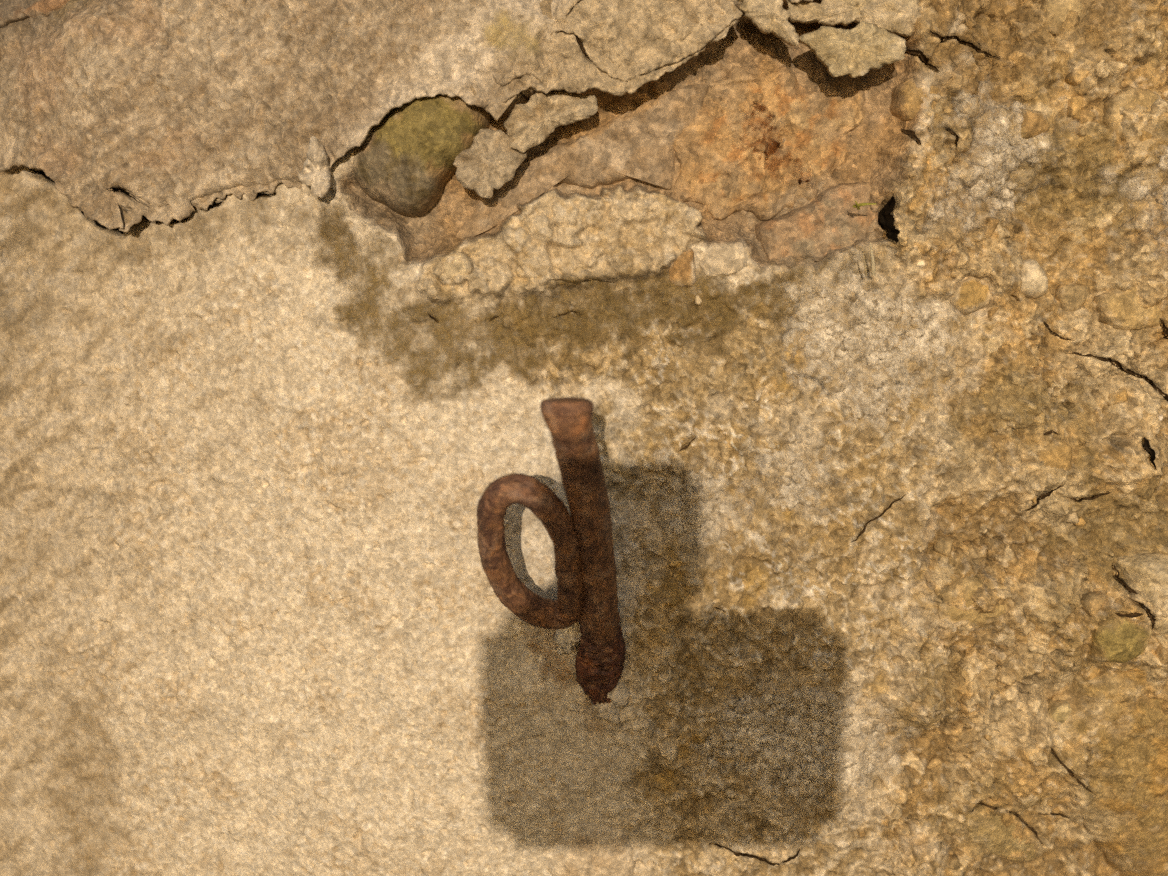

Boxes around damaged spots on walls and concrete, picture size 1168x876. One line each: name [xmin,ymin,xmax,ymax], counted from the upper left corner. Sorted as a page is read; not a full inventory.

crack [561,0,590,60]
crack [905,30,1000,72]
spalling [297,0,933,276]
crack [900,125,959,147]
crack [29,169,55,183]
crack [81,188,223,233]
crack [878,196,900,243]
crack [1043,318,1168,400]
crack [1144,437,1157,470]
crack [1025,484,1110,512]
crack [710,843,801,866]